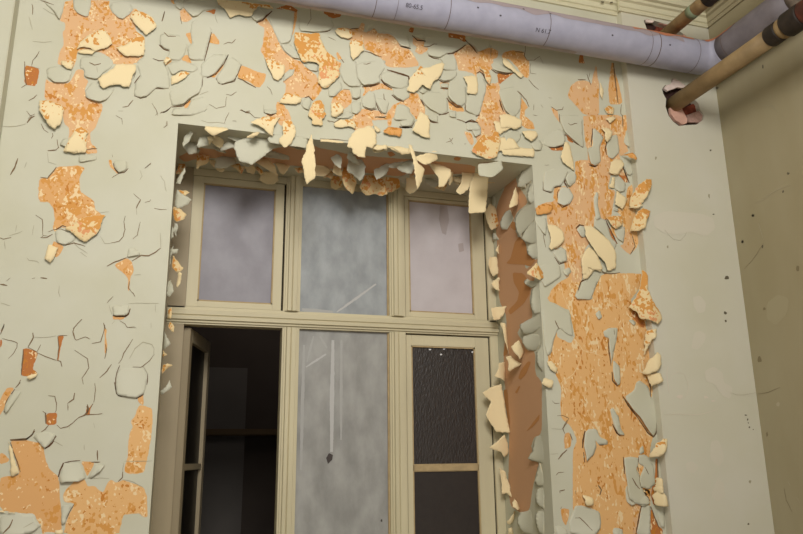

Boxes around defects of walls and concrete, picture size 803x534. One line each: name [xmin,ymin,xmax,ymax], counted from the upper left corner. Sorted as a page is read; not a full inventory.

crack [2,0,59,179]
peeling [24,0,144,154]
peeling [163,0,535,145]
peeling [0,388,21,415]
peeling [22,348,38,376]
peeling [38,165,101,257]
peeling [0,396,153,534]
crack [0,148,167,487]
peeling [115,259,134,291]
peeling [160,307,174,395]
peeling [167,63,663,534]